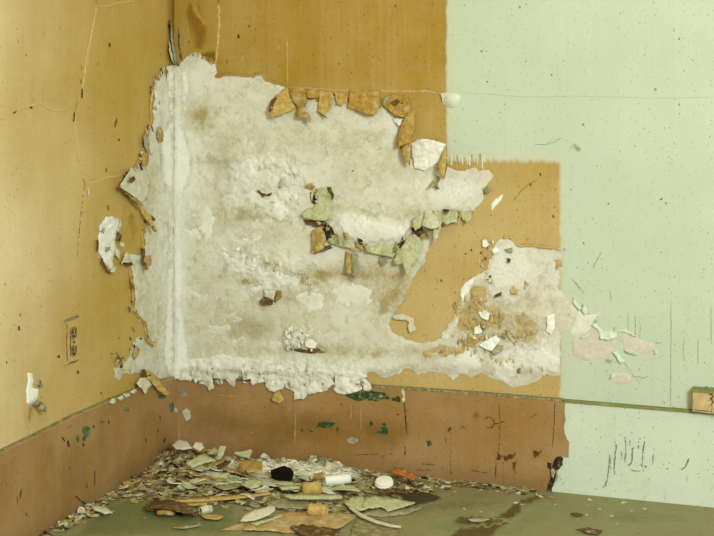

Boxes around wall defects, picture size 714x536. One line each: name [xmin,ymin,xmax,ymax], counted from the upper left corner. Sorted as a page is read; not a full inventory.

crack [168,20,183,66]
crack [213,0,221,64]
crack [1,0,138,256]
peeling [97,51,658,421]
peeling [25,372,47,430]
spalling [547,456,563,489]